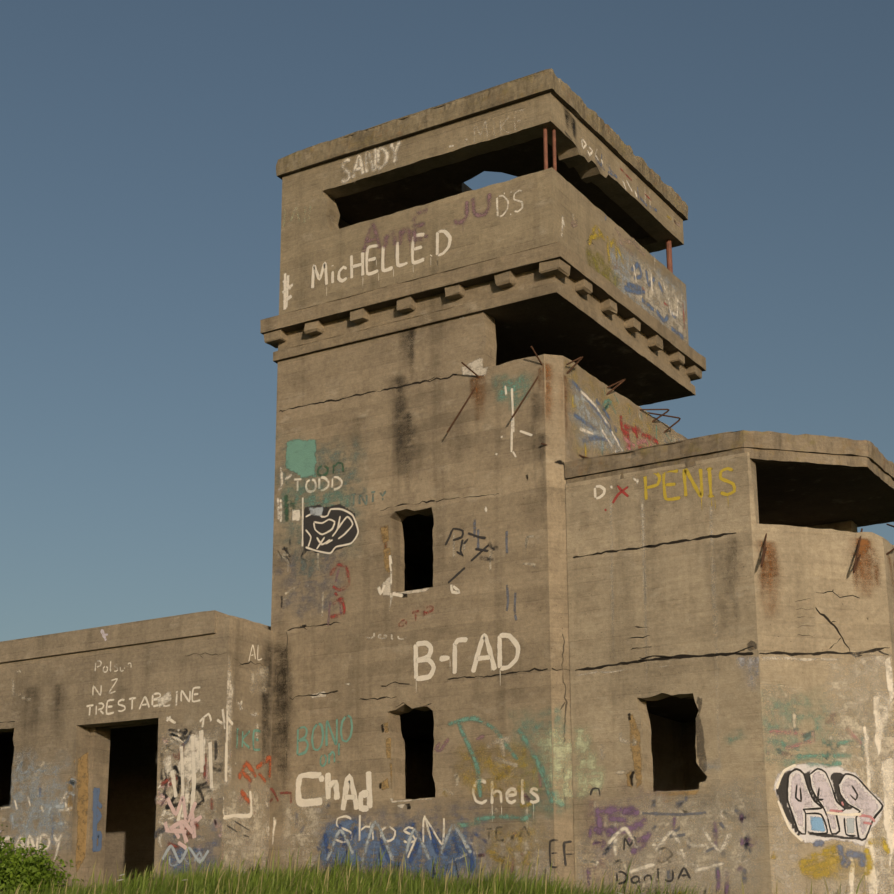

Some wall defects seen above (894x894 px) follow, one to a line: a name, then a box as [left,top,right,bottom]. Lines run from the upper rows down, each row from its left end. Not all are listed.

crack [279,374,457,412]
crack [573,533,736,558]
crack [448,590,890,810]